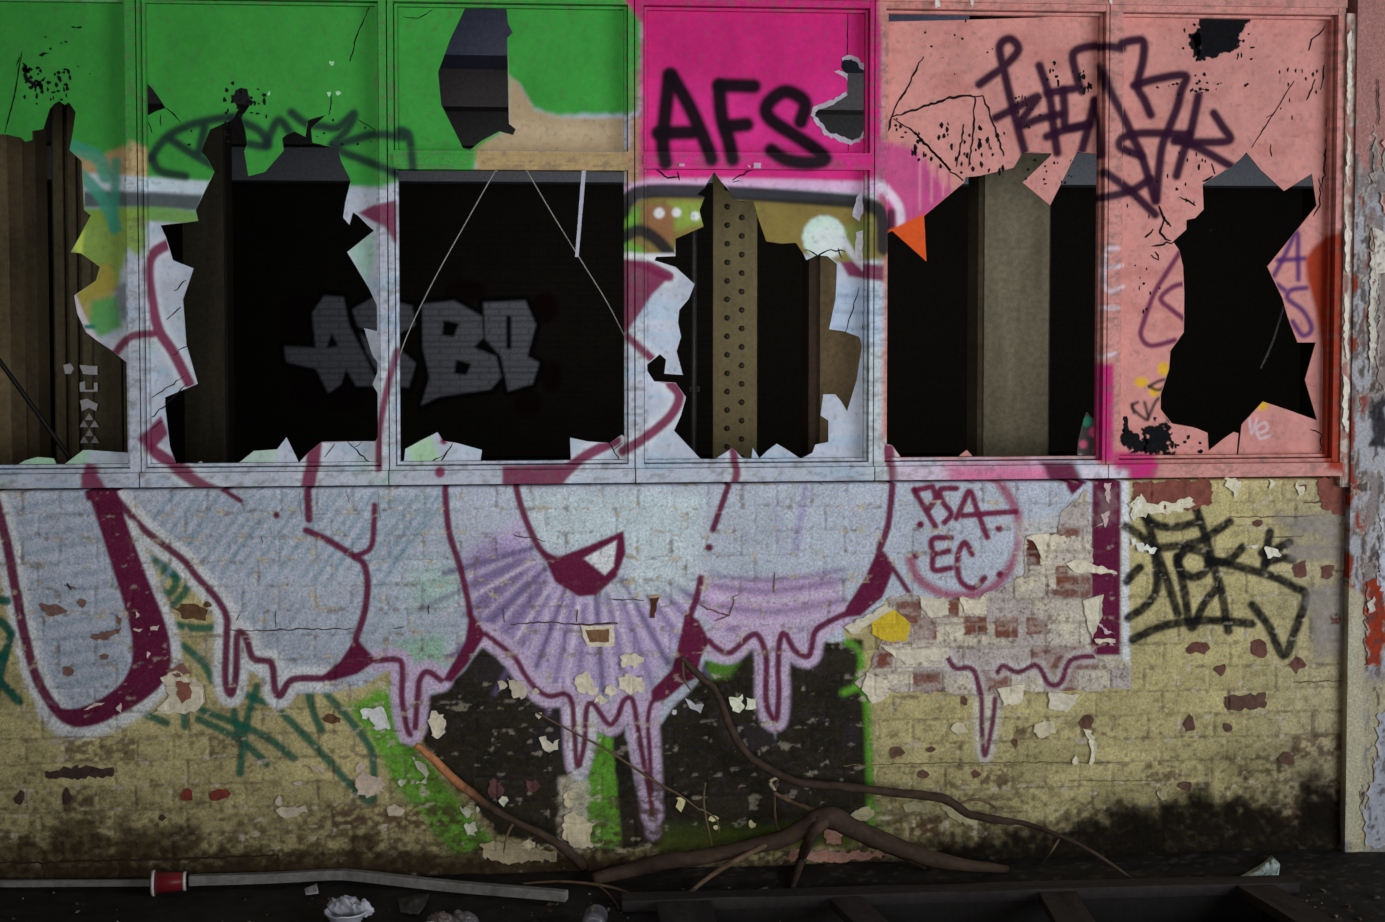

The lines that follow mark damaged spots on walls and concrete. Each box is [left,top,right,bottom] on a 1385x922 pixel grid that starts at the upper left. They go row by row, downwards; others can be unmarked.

crack [350,8,369,61]
peeling [1368,126,1385,391]
peeling [1342,293,1350,433]
spalling [1129,477,1241,521]
spalling [1295,477,1346,516]
peeling [1128,538,1157,554]
spalling [845,483,1132,765]
peeling [1364,513,1385,667]
spalling [1224,692,1267,732]
water stain [0,822,629,879]
water stain [928,773,1341,860]
peeling [1360,712,1385,848]